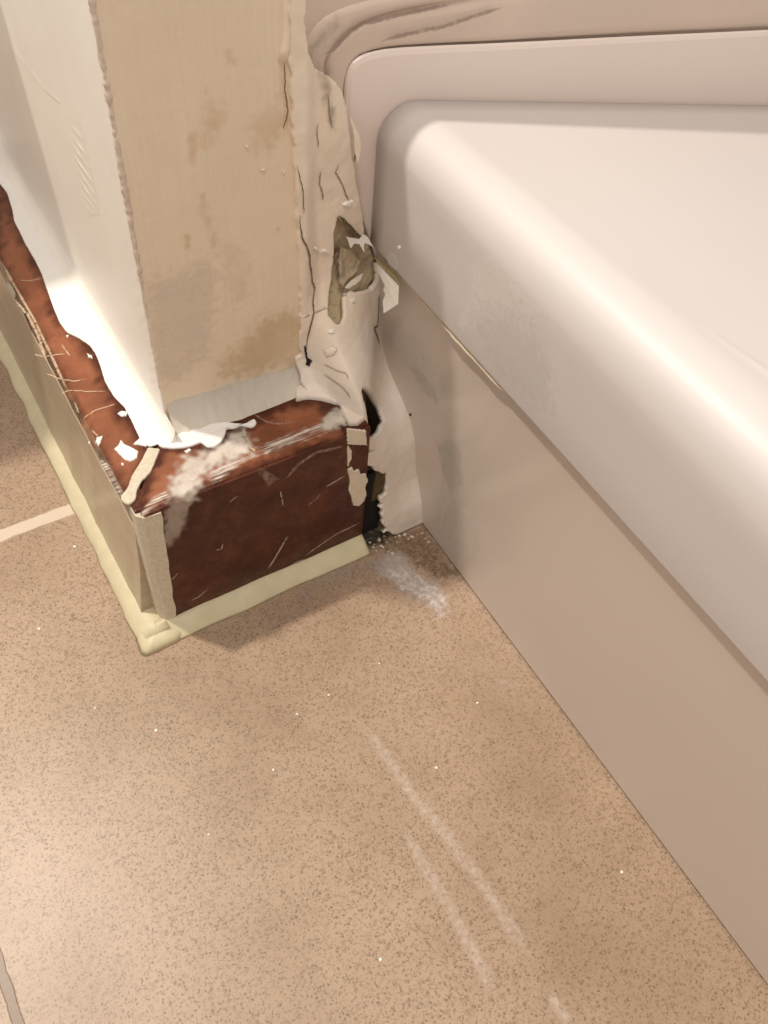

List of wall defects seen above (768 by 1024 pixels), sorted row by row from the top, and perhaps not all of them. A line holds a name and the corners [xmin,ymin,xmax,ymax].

crack [282,64,290,129]
crack [297,95,362,398]
peeling [314,218,401,334]
peeling [347,446,368,506]